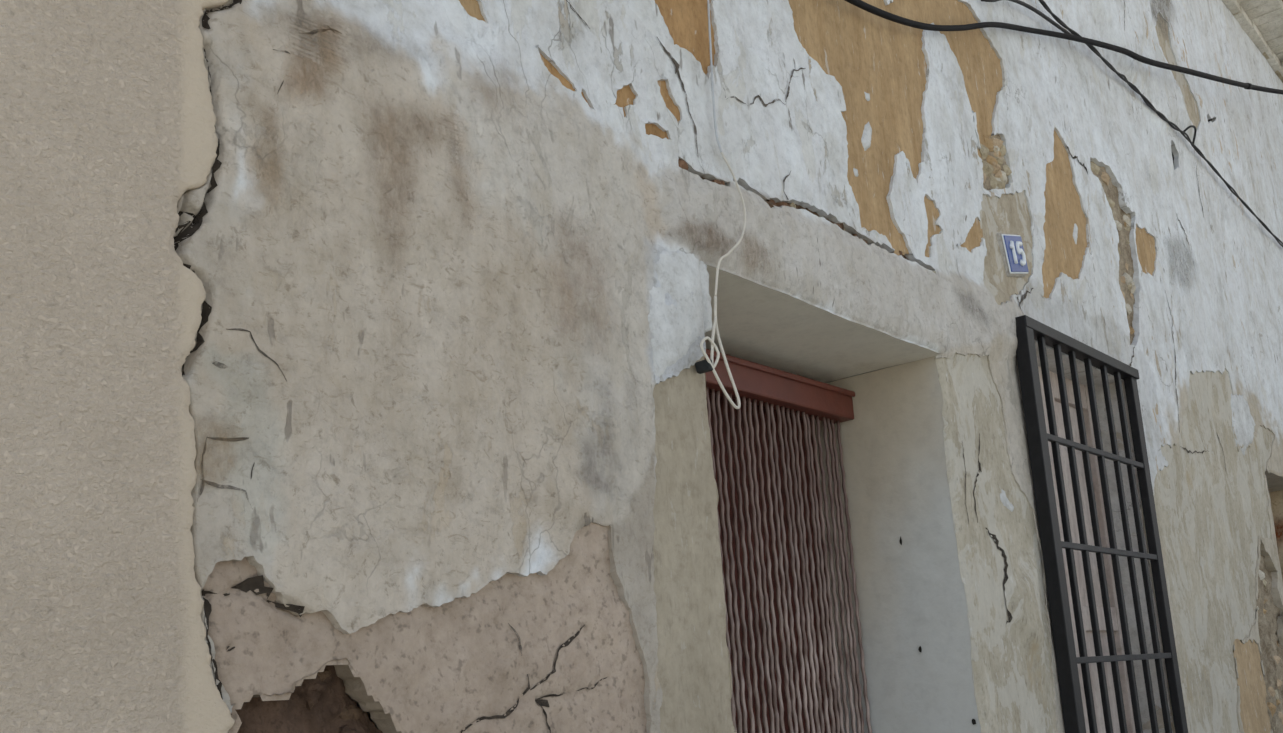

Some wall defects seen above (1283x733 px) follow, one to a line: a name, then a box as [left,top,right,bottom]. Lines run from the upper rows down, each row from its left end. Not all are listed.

flaking render [454,0,492,29]
crack [657,37,705,174]
crack [724,67,805,107]
flaking render [534,0,1159,349]
flaking render [1168,135,1181,173]
flaking render [1152,7,1218,136]
flaking render [200,250,735,733]
crack [963,433,1013,624]
flaking render [1152,365,1283,733]
crack [461,623,607,733]